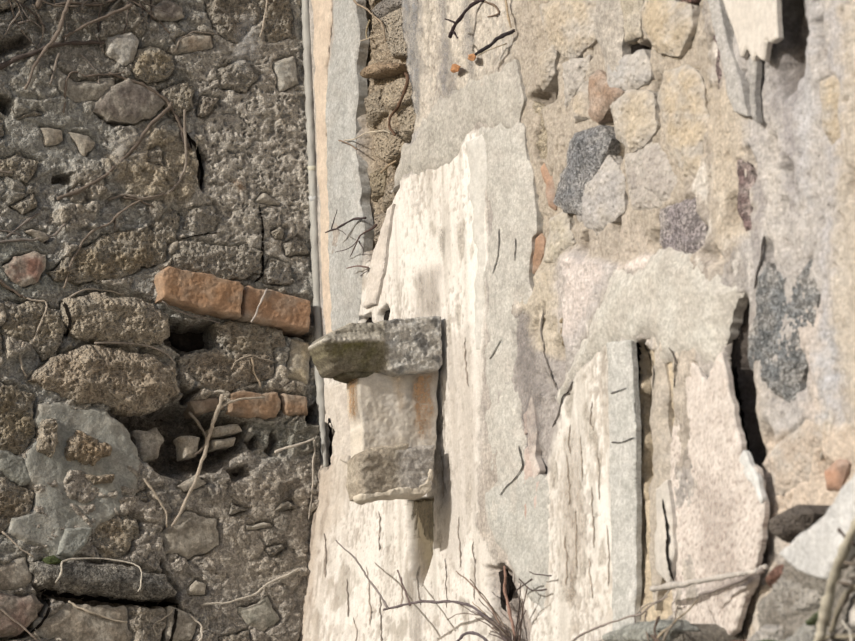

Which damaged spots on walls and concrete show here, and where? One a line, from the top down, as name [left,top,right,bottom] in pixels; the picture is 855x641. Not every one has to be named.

flaking render [707,0,784,124]
crack [174,113,204,186]
spalling [360,0,416,308]
crack [254,204,264,283]
flaking render [333,383,351,457]
flaking render [523,393,546,520]
crack [612,342,676,410]
crack [730,330,753,457]
flaking render [564,424,593,596]
crack [662,500,674,581]
crack [30,588,178,641]
flaking render [366,569,382,641]